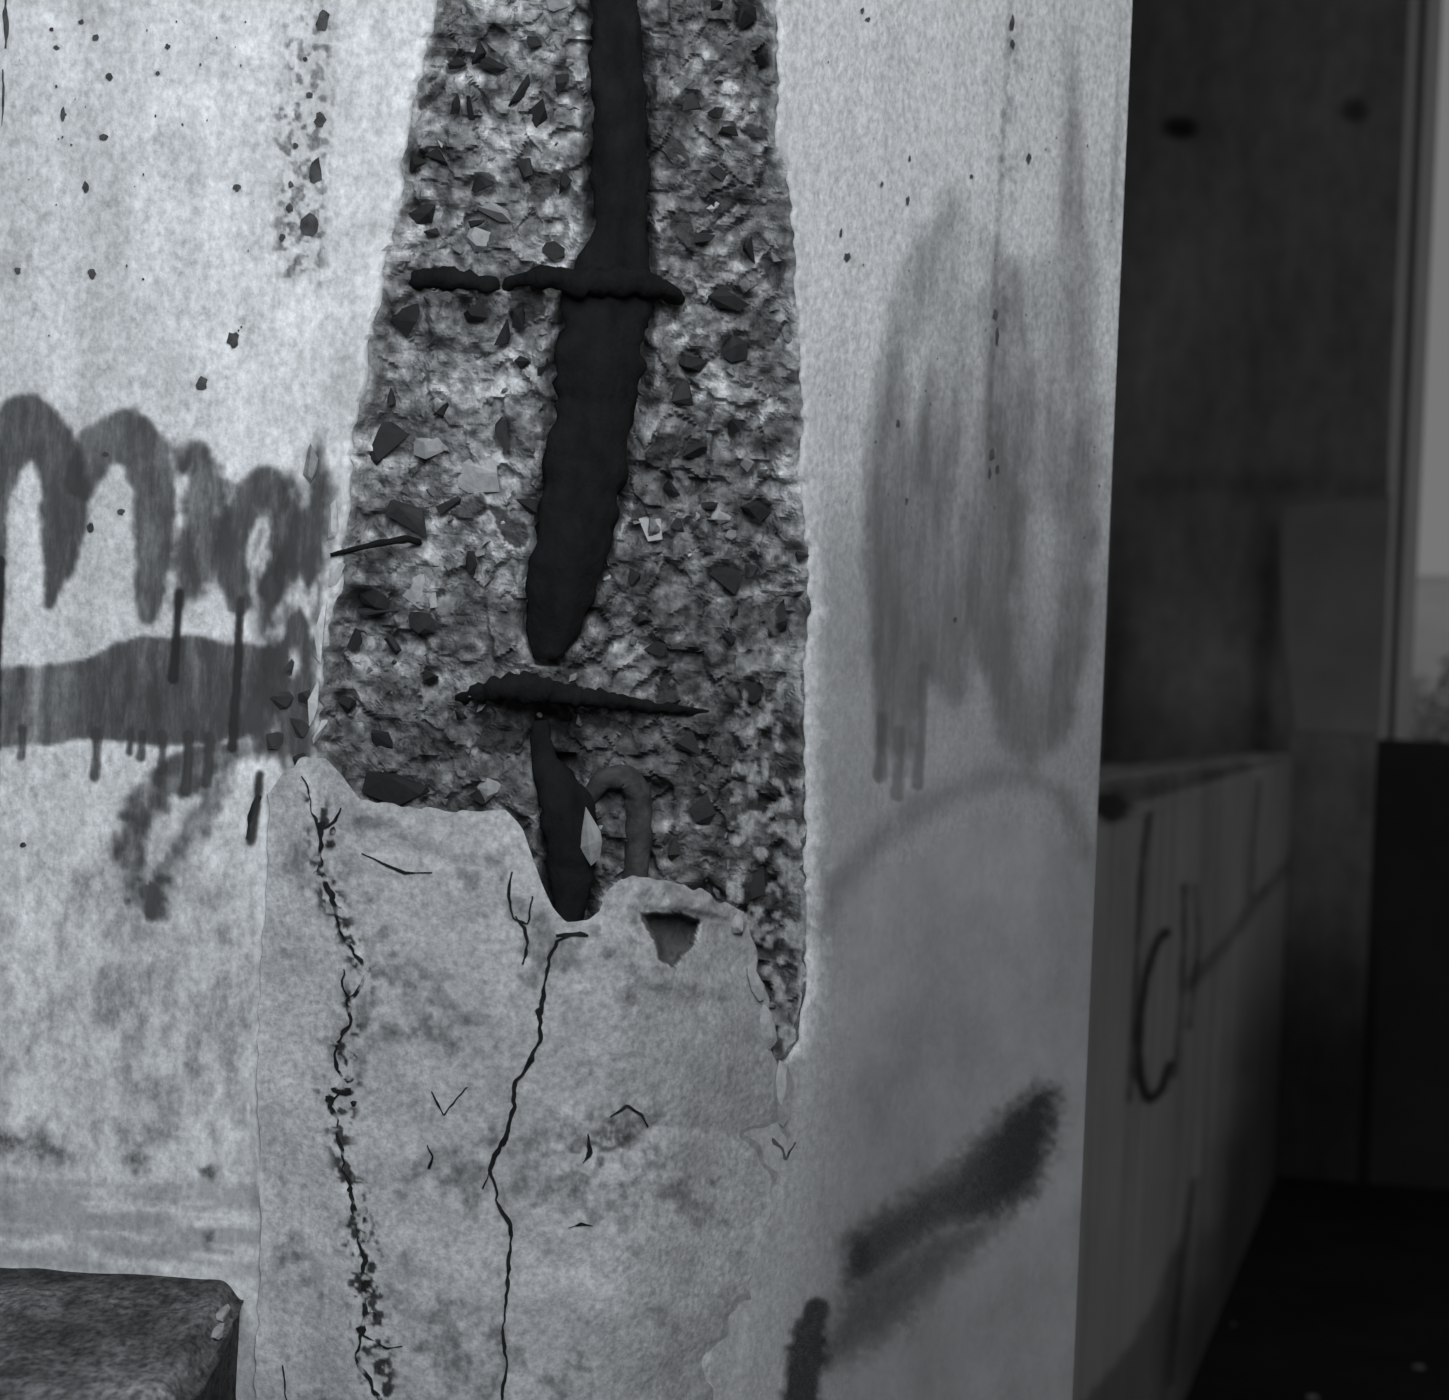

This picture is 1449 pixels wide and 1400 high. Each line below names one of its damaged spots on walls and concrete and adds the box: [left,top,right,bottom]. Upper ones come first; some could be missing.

spalling [239,0,820,1063]
crack [280,1365,288,1400]
crack [301,776,432,1400]
crack [482,871,588,1400]
crack [583,1105,649,1163]